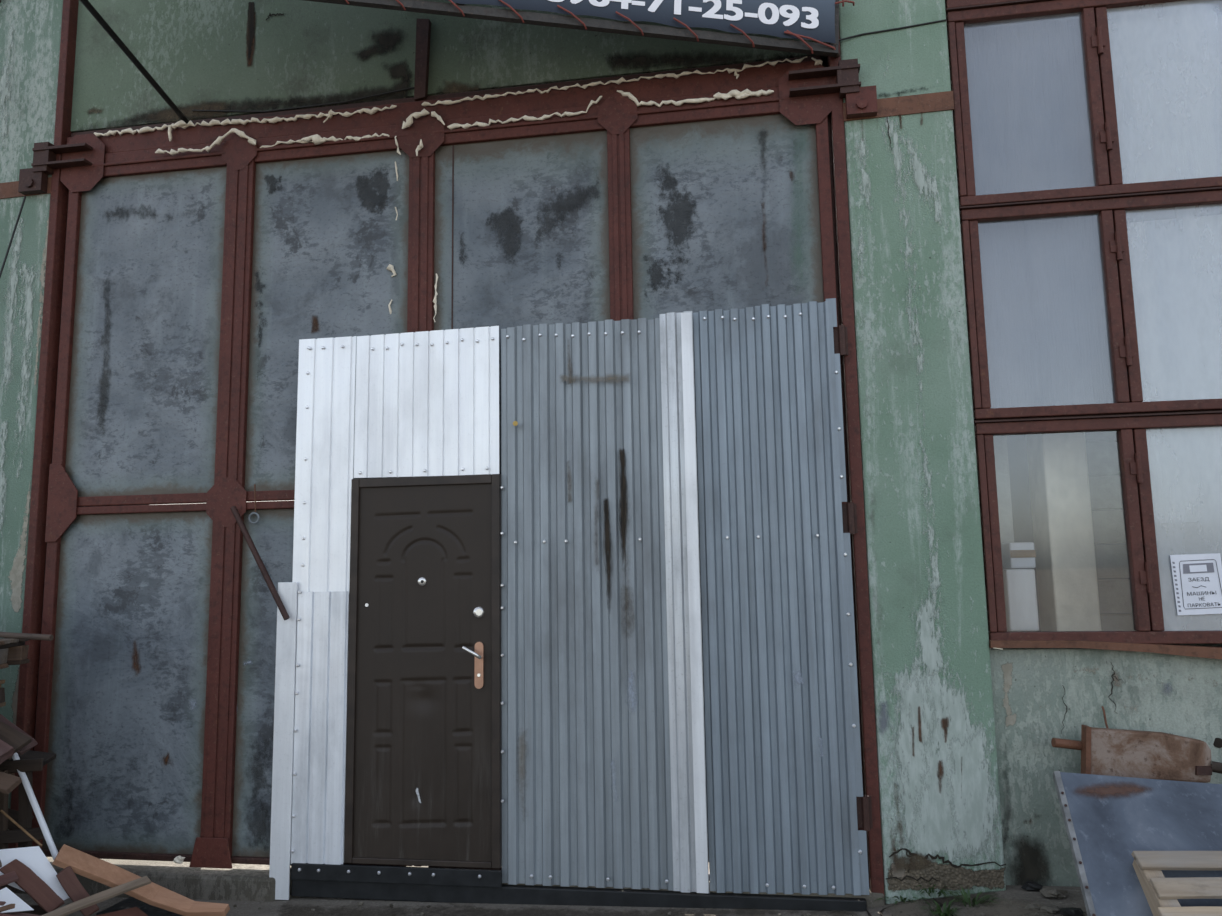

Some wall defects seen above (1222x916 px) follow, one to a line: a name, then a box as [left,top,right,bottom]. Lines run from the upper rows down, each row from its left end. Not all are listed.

peeling [0,26,13,136]
peeling [882,117,942,392]
peeling [0,217,49,612]
corrosion [912,707,922,756]
peeling [887,440,1006,892]